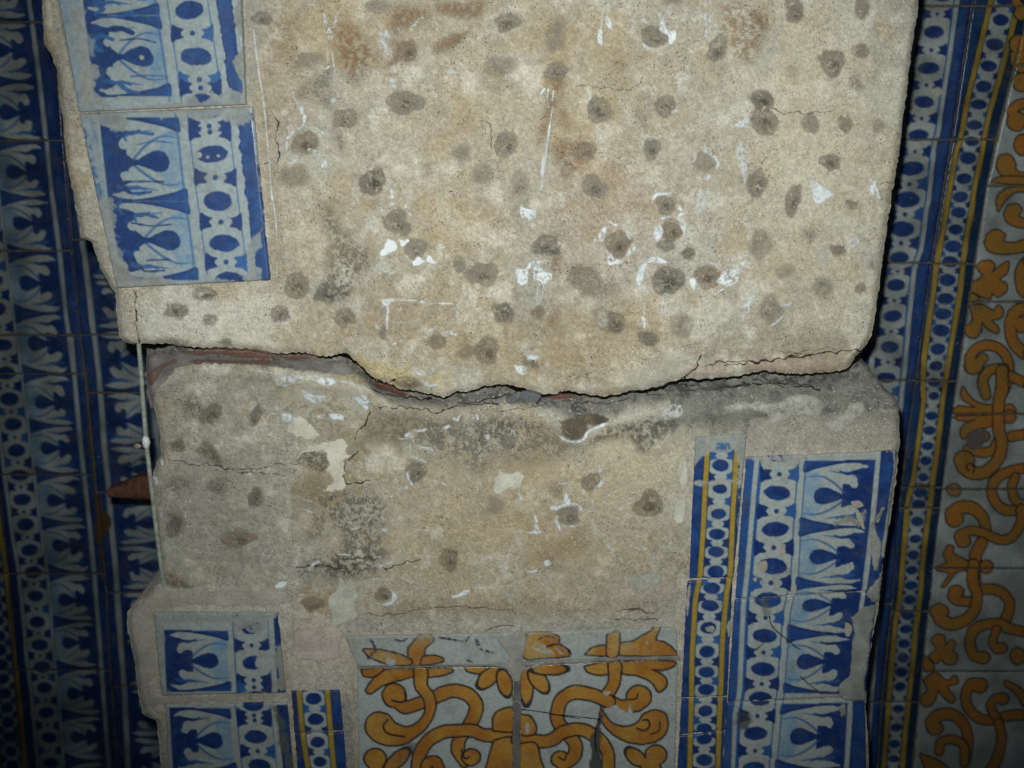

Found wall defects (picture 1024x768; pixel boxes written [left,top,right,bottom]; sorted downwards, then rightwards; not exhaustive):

spalling [145,340,369,492]
crack [134,291,862,485]